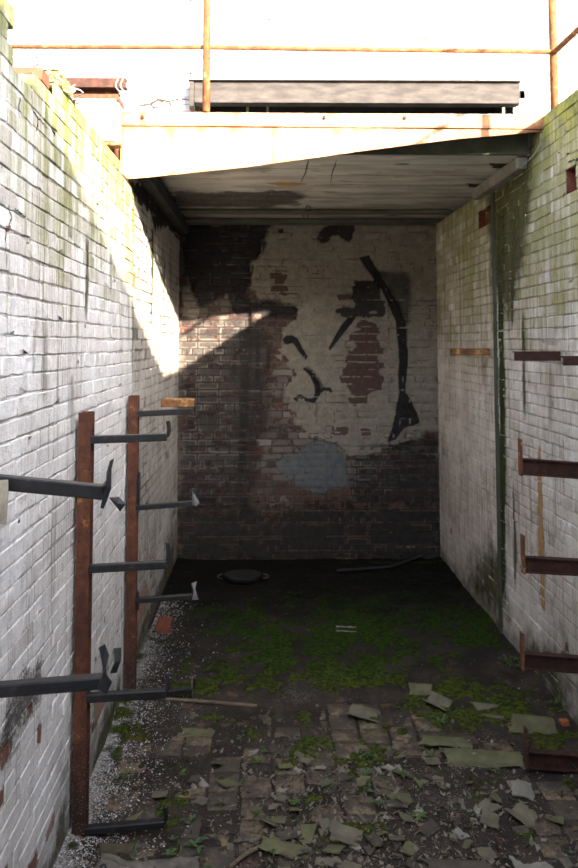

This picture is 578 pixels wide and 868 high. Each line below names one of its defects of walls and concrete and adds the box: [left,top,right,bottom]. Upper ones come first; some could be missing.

peeling [270,270,289,296]
peeling [335,279,385,406]
rust [161,398,195,407]
damp [19,656,43,679]
damp [0,695,42,773]